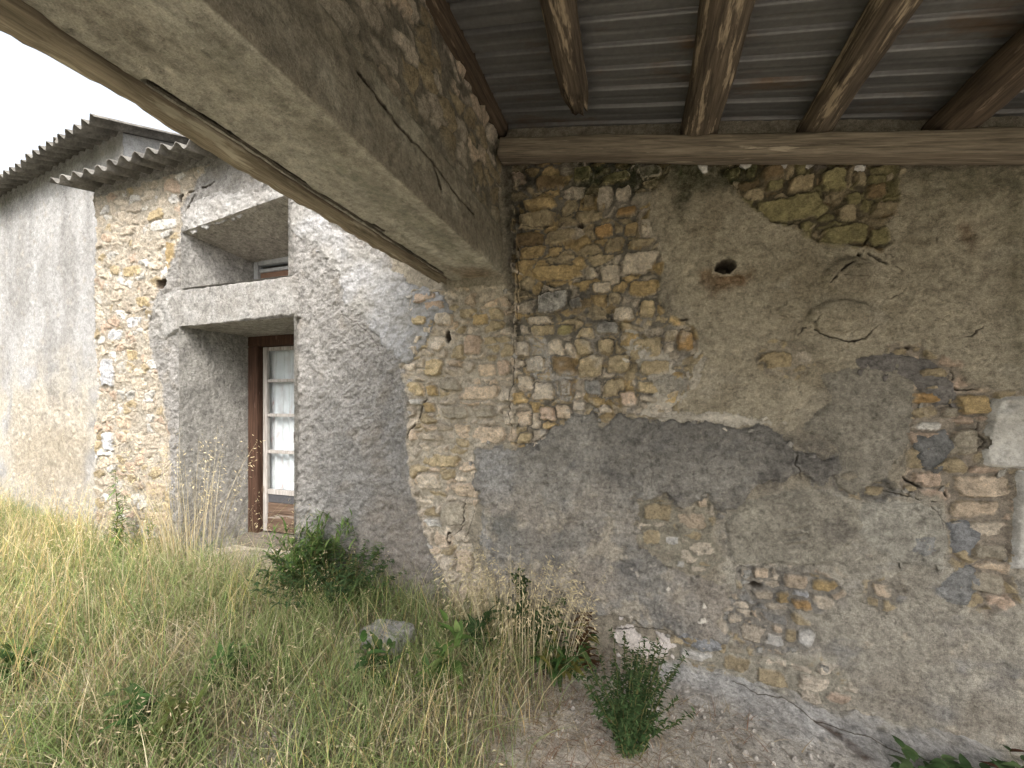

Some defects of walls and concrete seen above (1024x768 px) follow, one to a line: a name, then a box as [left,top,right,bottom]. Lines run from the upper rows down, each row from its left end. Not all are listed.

crack [146,79,444,274]
spalling [1,162,786,623]
crack [356,72,475,215]
spalling [718,164,907,253]
crack [795,310,883,346]
crack [827,234,897,286]
spalling [830,340,1024,619]
spalling [614,497,864,705]
crack [732,681,931,761]